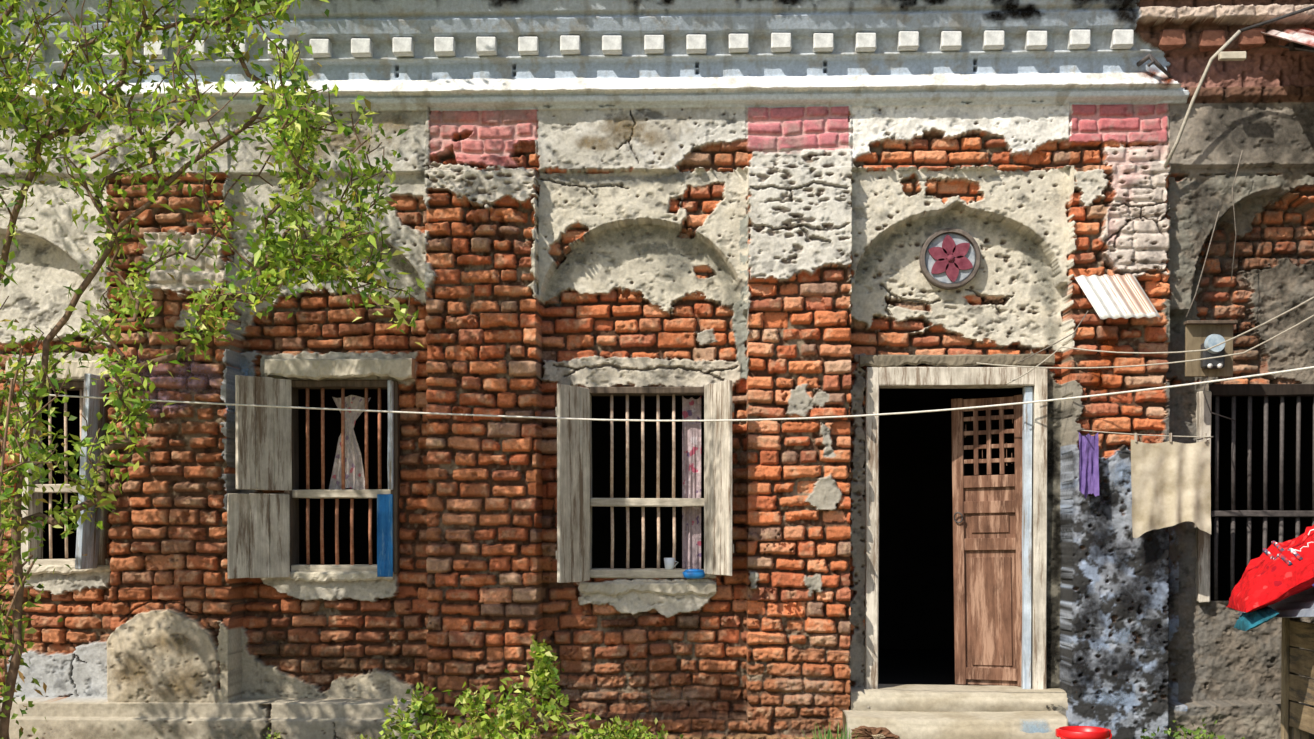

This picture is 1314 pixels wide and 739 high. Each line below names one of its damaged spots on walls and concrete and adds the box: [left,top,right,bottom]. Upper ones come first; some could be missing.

leakage [893,0,945,10]
leakage [985,0,1042,20]
crack [616,109,637,150]
flaking render [1195,184,1314,384]
flaking render [0,129,1182,739]
leakage [1046,429,1175,693]